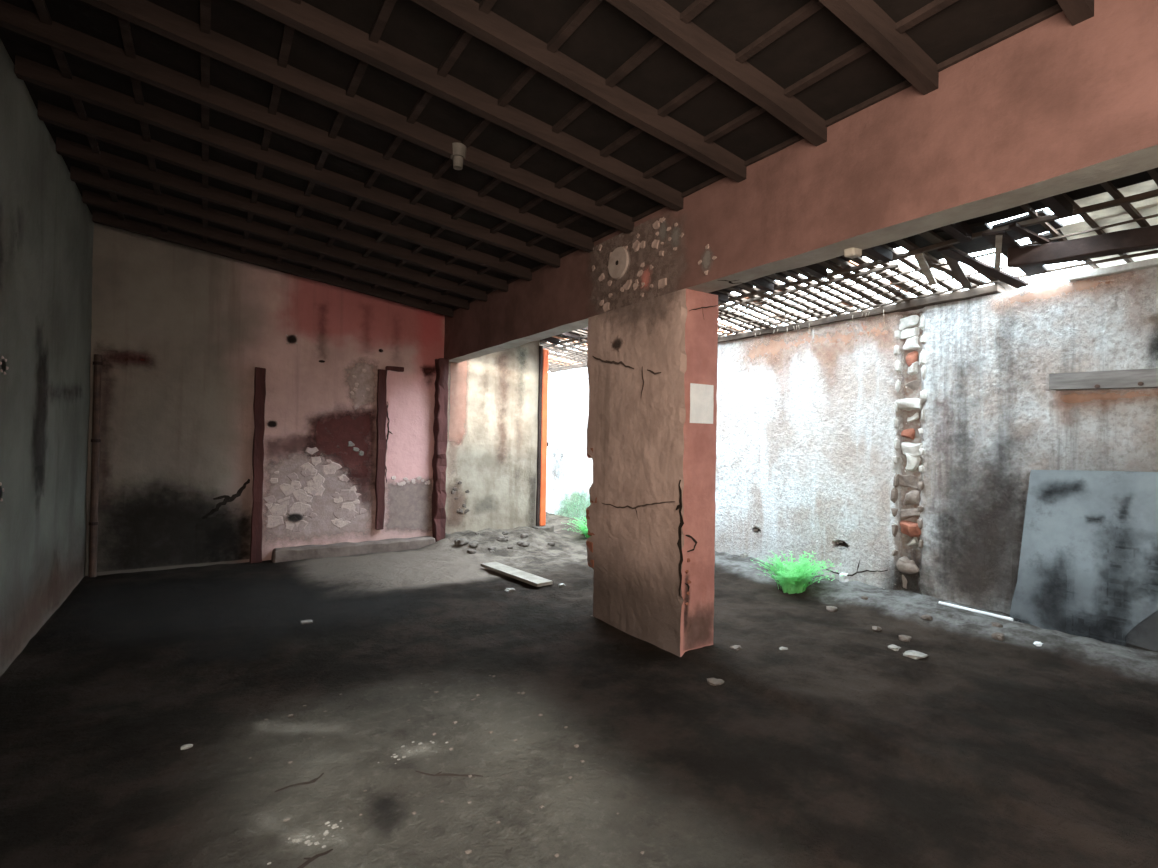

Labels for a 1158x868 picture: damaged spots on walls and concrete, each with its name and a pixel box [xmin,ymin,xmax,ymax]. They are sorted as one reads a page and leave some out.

crack [592,356,661,396]
water stain [104,487,249,571]
crack [213,479,250,511]
flaking render [263,447,371,540]
water stain [269,410,376,501]
flaking render [386,476,432,532]
crack [602,480,697,596]
flaking render [890,312,927,589]
water stain [945,481,1029,624]